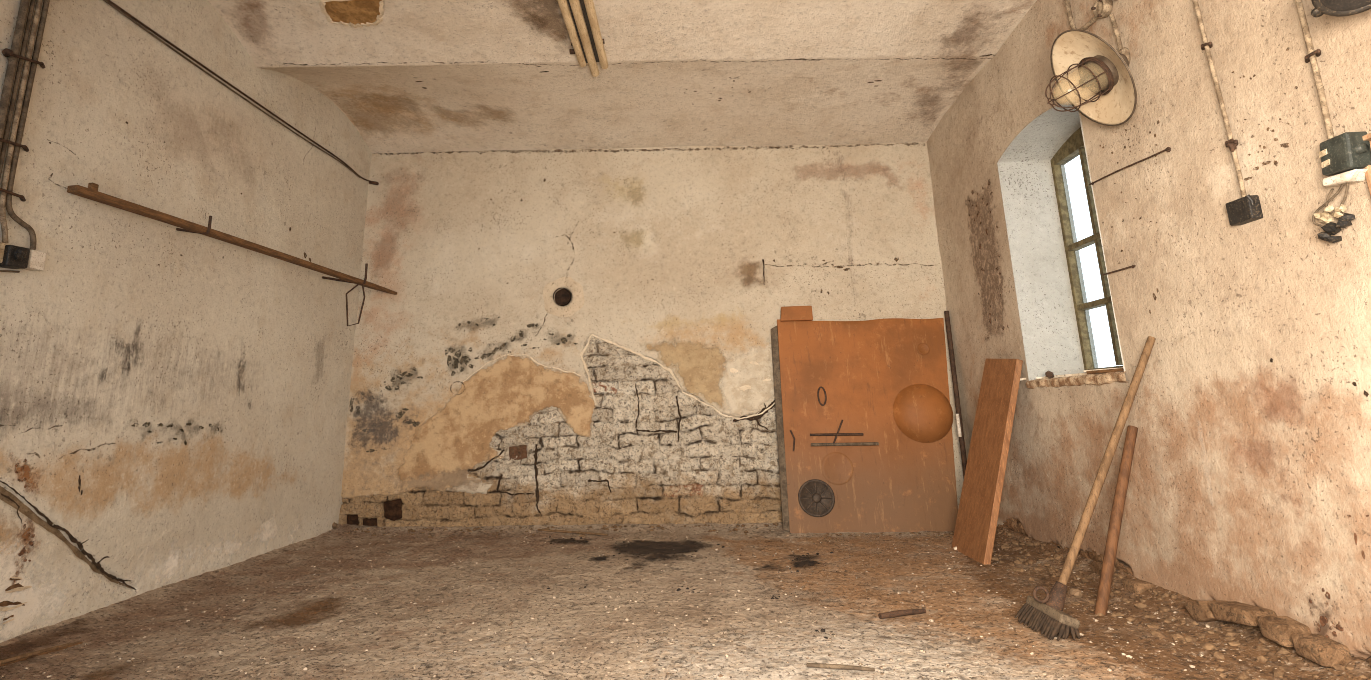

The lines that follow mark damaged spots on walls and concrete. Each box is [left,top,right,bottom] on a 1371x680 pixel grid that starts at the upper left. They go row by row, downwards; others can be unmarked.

water stain [132,422,219,445]
water stain [349,368,423,452]
flaking render [338,334,782,527]
crack [0,481,136,590]